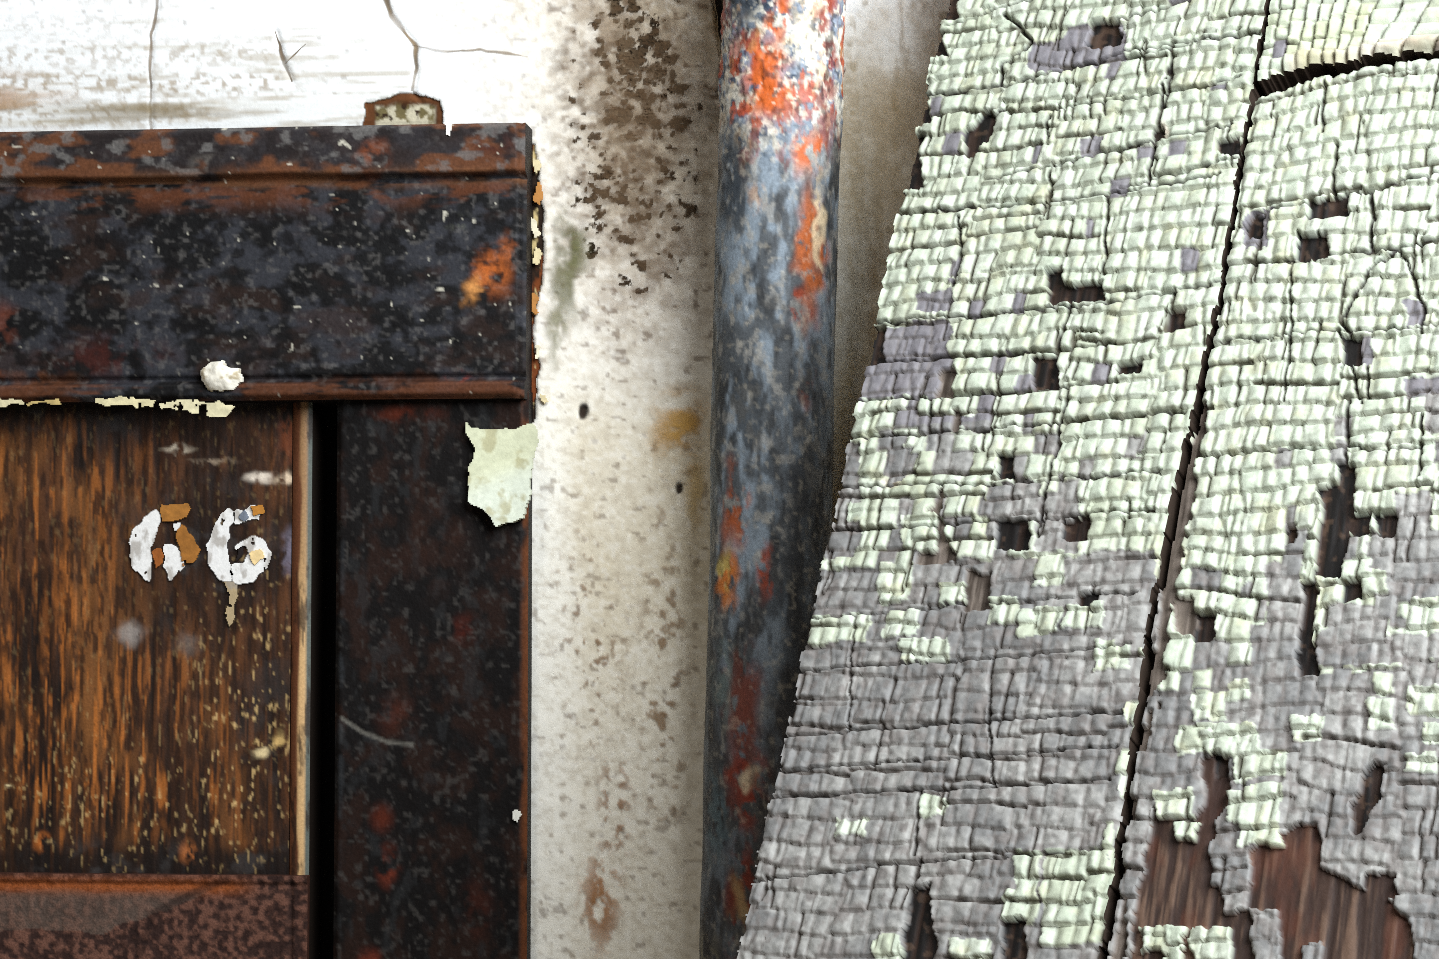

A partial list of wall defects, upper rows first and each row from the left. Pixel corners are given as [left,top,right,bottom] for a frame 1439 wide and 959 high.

crack [149,0,158,89]
crack [384,0,519,94]
damp [552,227,583,324]